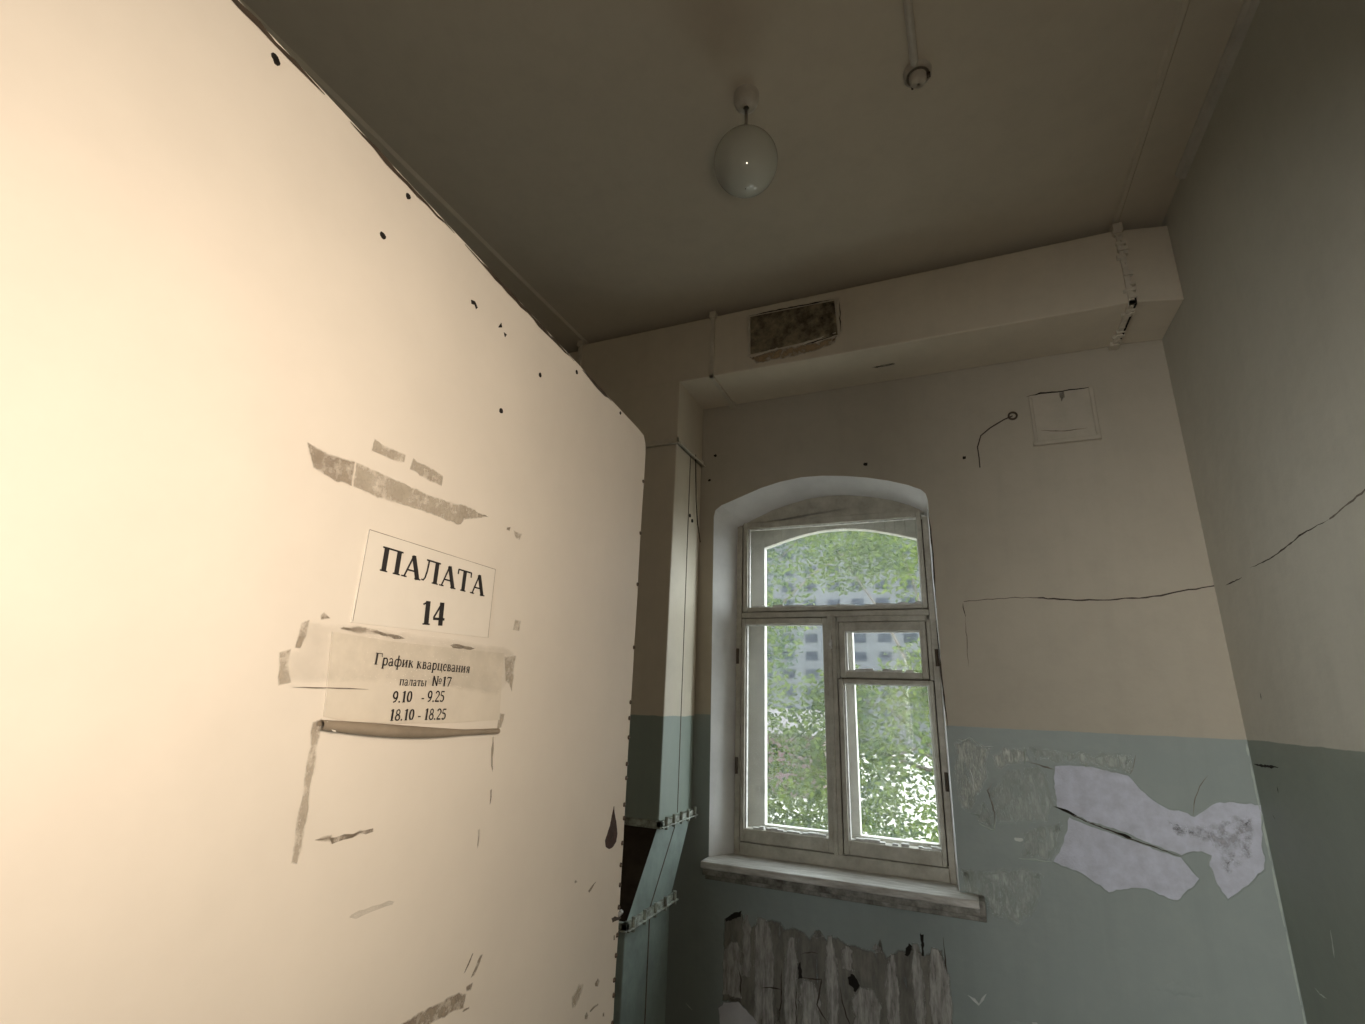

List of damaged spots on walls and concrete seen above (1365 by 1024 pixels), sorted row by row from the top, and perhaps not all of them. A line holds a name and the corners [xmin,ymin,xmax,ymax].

crack [928,489,1365,725]
peeling [1030,744,1306,1024]